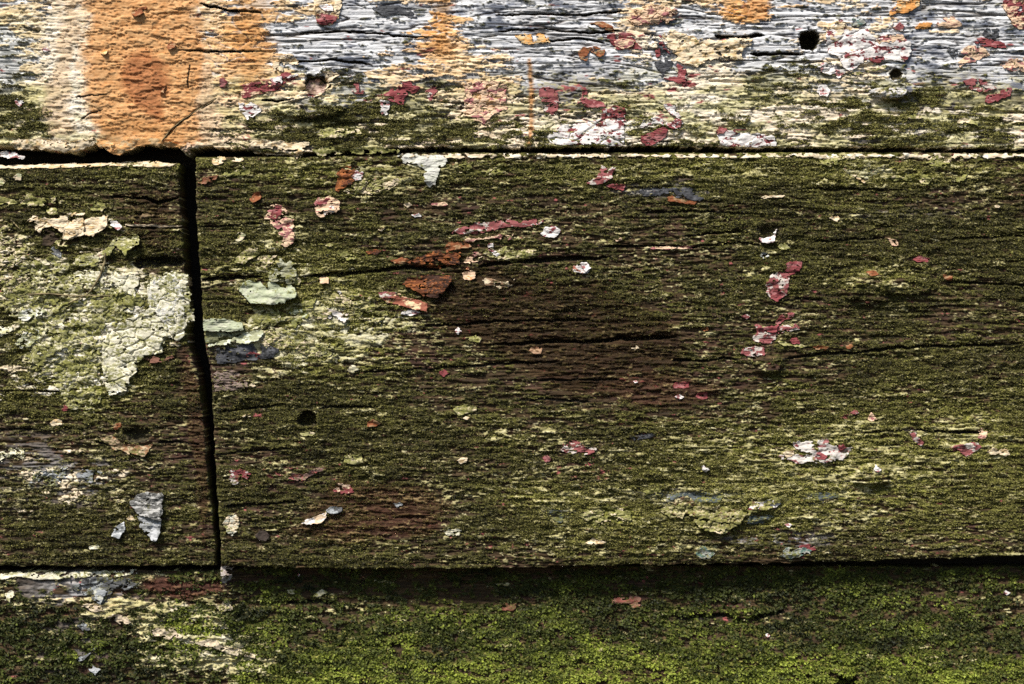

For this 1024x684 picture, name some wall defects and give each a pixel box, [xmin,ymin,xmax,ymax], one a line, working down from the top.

crack [164,30,428,140]
peeling [578,5,753,86]
peeling [817,0,962,97]
peeling [198,78,1024,218]
peeling [0,136,428,426]
peeling [445,219,561,289]
crack [302,210,760,277]
peeling [740,229,829,357]
peeling [779,439,853,464]
peeling [111,492,164,542]
peeling [643,488,782,534]
peeling [0,569,139,624]